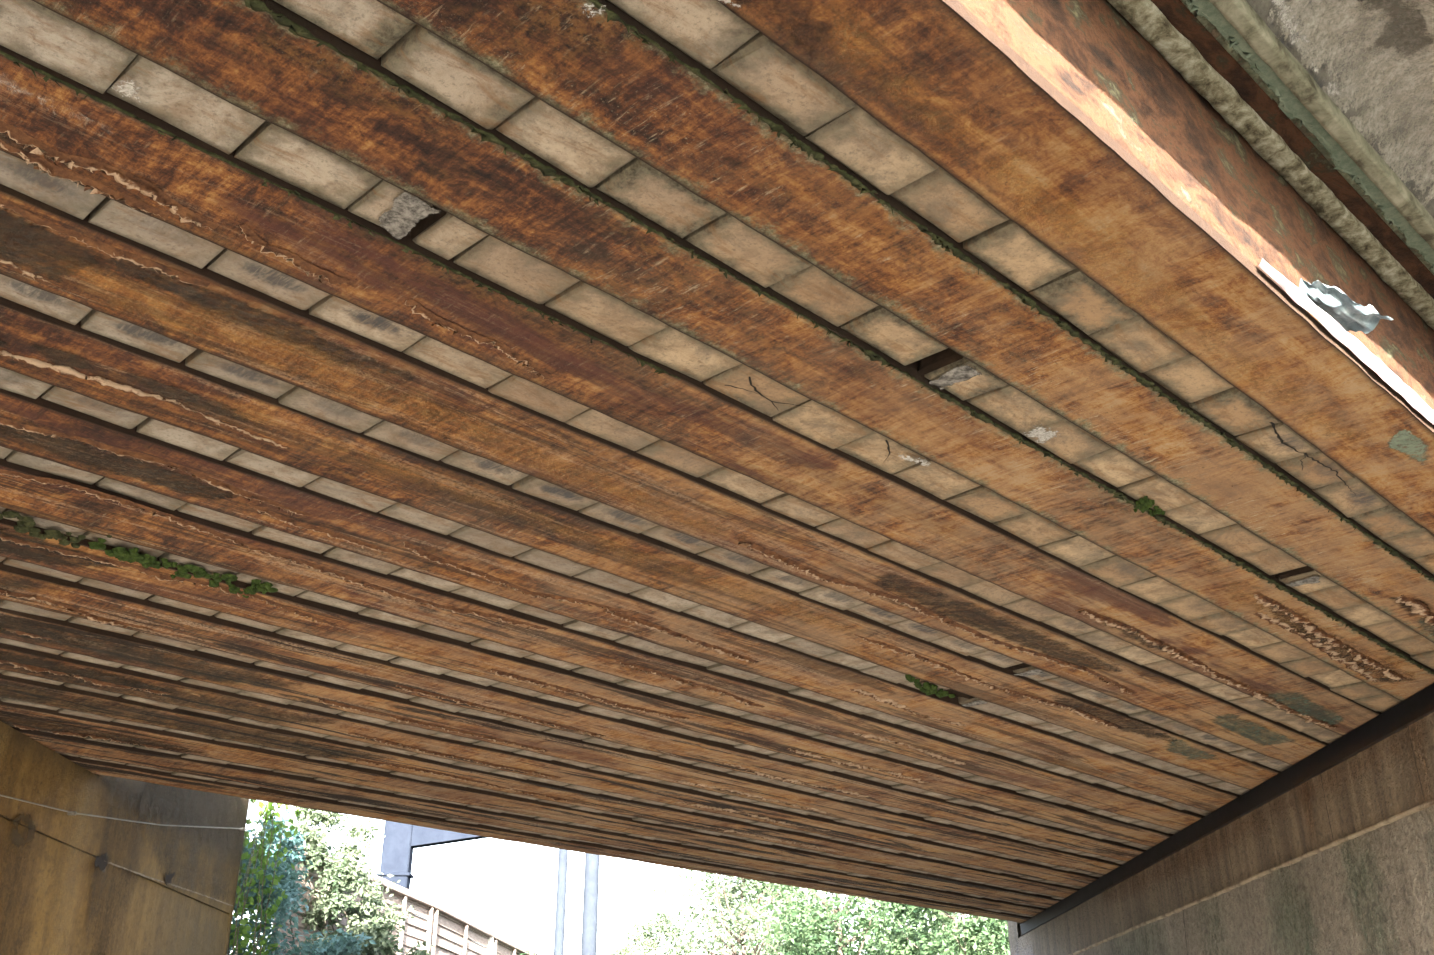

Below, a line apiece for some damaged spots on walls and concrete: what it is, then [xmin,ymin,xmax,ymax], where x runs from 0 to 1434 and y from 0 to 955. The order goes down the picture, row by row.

damp [1267,0,1434,207]
spalling [377,192,447,240]
spalling [917,348,982,390]